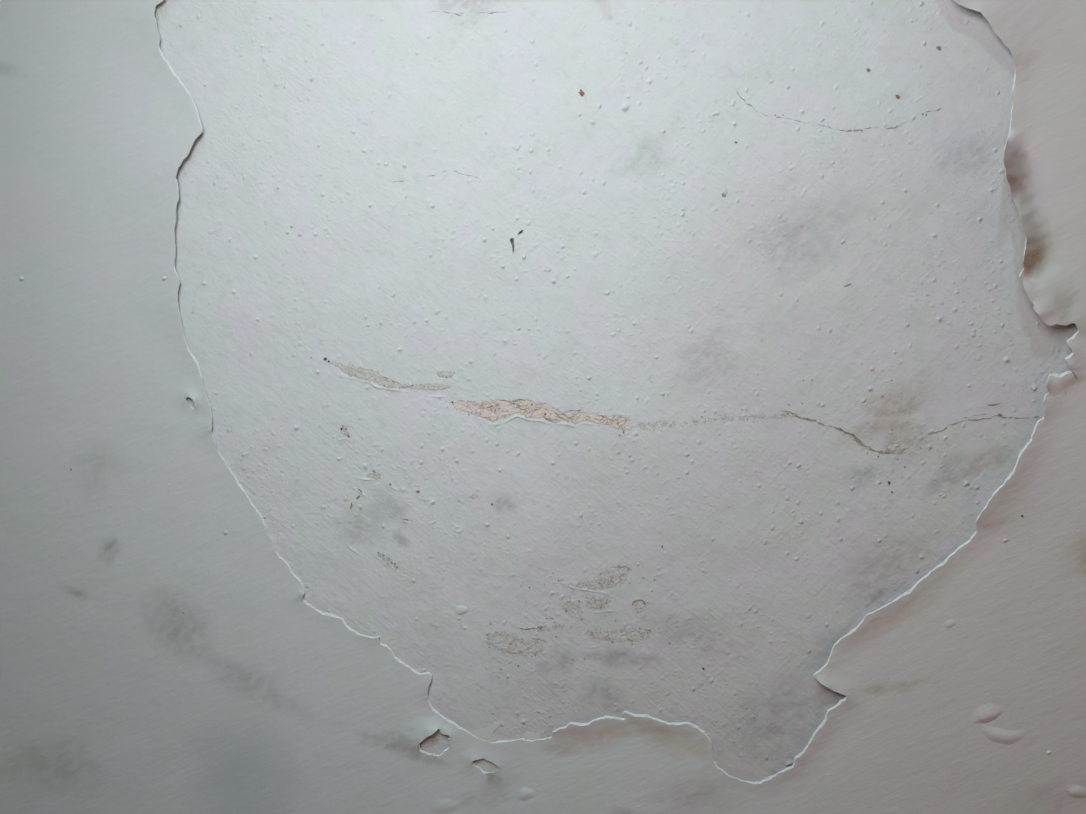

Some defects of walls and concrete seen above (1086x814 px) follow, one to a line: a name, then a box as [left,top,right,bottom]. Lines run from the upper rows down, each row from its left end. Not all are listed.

crack [310,357,1040,468]
peeling [981,413,1044,512]
spalling [577,566,630,589]
peeling [867,530,977,615]
spalling [487,631,543,656]
spalling [588,627,652,642]
peeling [813,616,866,677]
peeling [419,729,451,756]
peeling [552,715,625,734]
peeling [623,711,712,744]
peeling [736,695,847,784]
peeling [472,758,498,774]